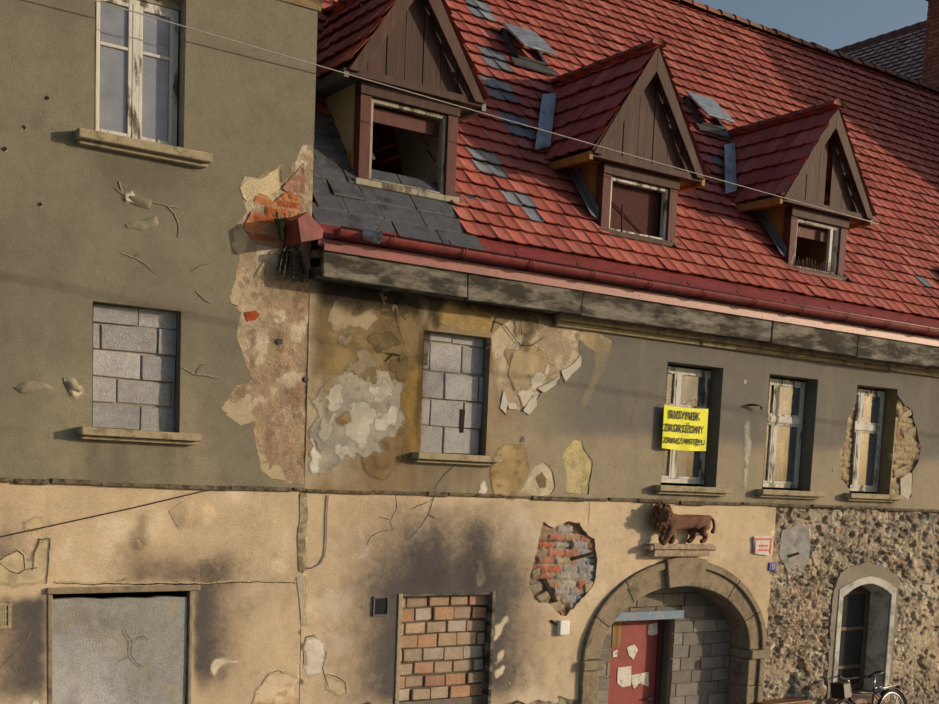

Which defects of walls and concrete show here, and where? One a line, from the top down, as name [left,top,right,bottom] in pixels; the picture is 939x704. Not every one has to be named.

crack [152,201,180,238]
spalling [222,144,406,626]
peeling [437,300,612,415]
spalling [840,406,855,487]
spalling [888,397,920,499]
crack [366,464,456,546]
spalling [529,521,596,616]
crack [122,623,148,668]
peeling [254,638,345,704]